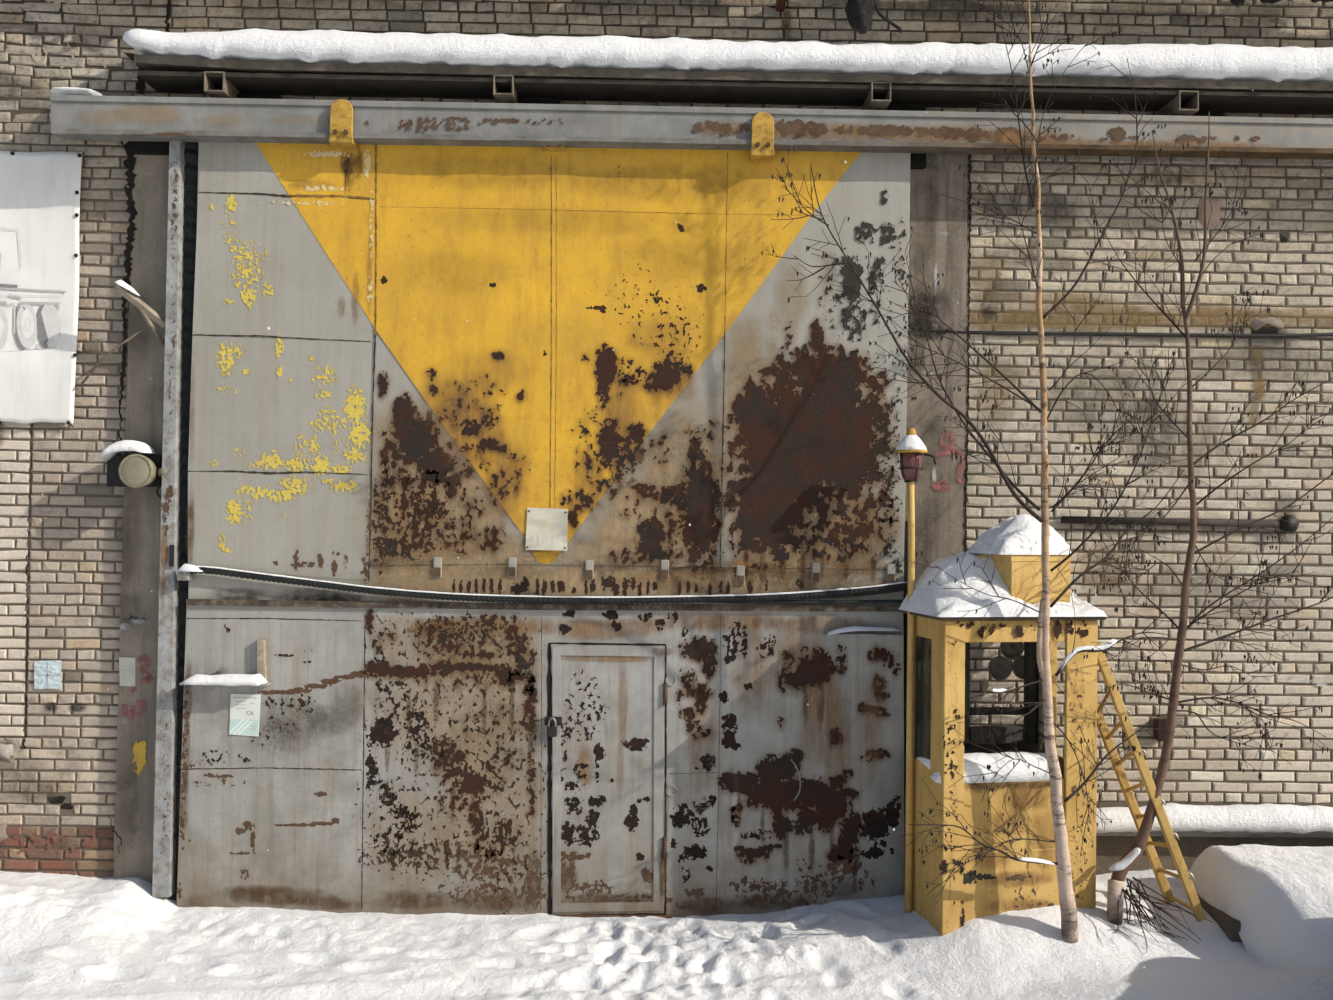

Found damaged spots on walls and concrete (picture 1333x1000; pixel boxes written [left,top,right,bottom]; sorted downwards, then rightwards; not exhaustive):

peeling [210,194,274,310]
peeling [260,184,344,206]
peeling [298,149,388,302]
peeling [215,342,250,393]
peeling [275,332,293,382]
peeling [219,355,531,584]
corrosion [371,401,887,600]
peeling [452,217,906,631]
peeling [251,694,316,748]
corrosion [407,619,535,772]
peeling [230,821,256,880]
corrosion [975,782,1050,808]